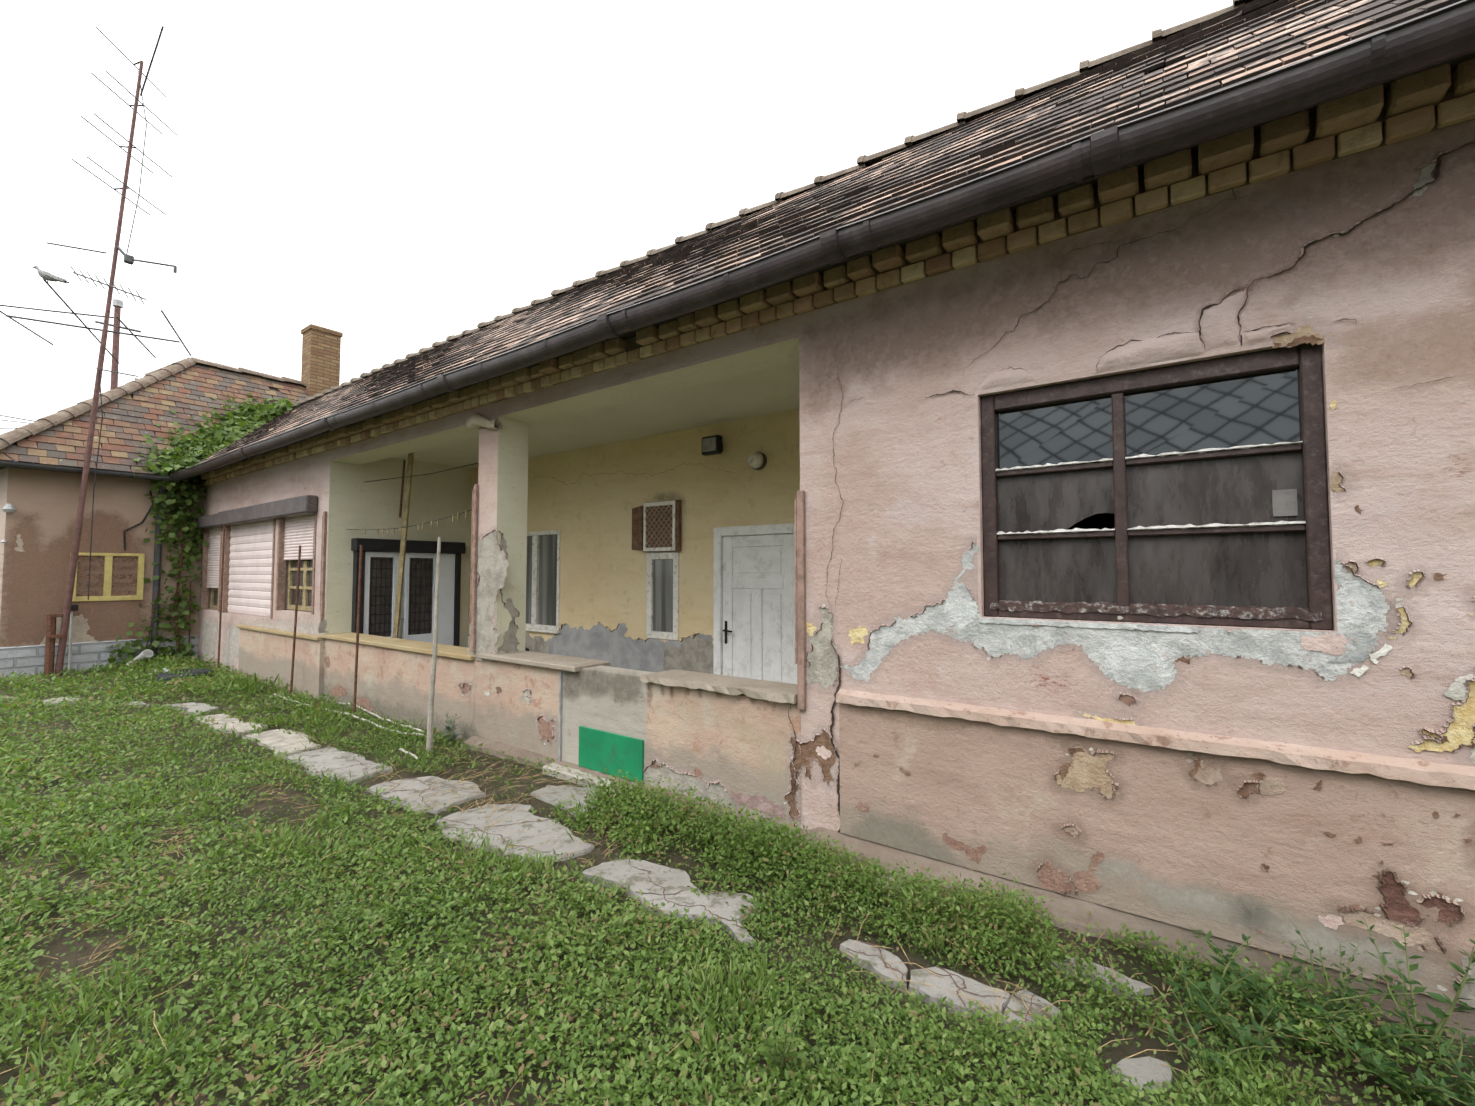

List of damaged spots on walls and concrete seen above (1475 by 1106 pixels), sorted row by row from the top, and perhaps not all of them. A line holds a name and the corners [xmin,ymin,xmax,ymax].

crack [927,189,1258,398]
crack [1097,140,1475,371]
peeling [458,682,501,696]
flaking render [469,529,520,662]
peeling [518,688,555,745]
flaking render [643,728,837,826]
crack [788,317,862,833]
flaking render [1053,746,1120,800]
flaking render [806,541,1446,726]
peeling [1408,668,1475,764]
peeling [942,831,991,864]
flaking render [1318,836,1475,1008]